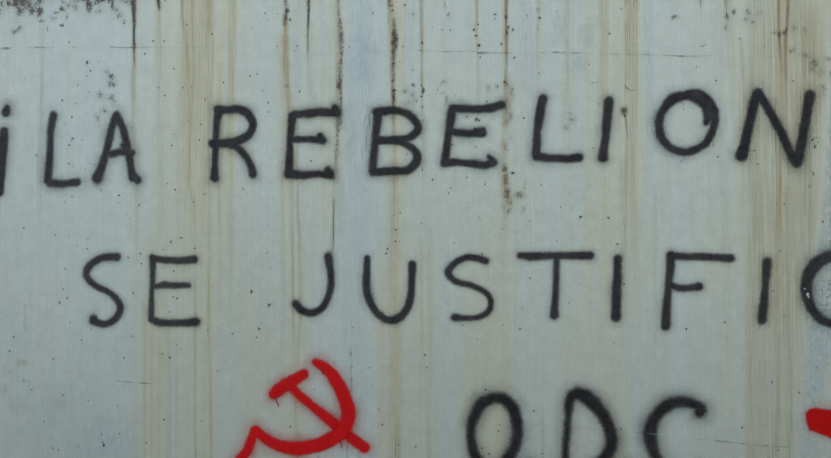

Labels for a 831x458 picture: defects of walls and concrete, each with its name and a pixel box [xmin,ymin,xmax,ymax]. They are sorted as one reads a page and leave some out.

corrosion [388,0,398,115]